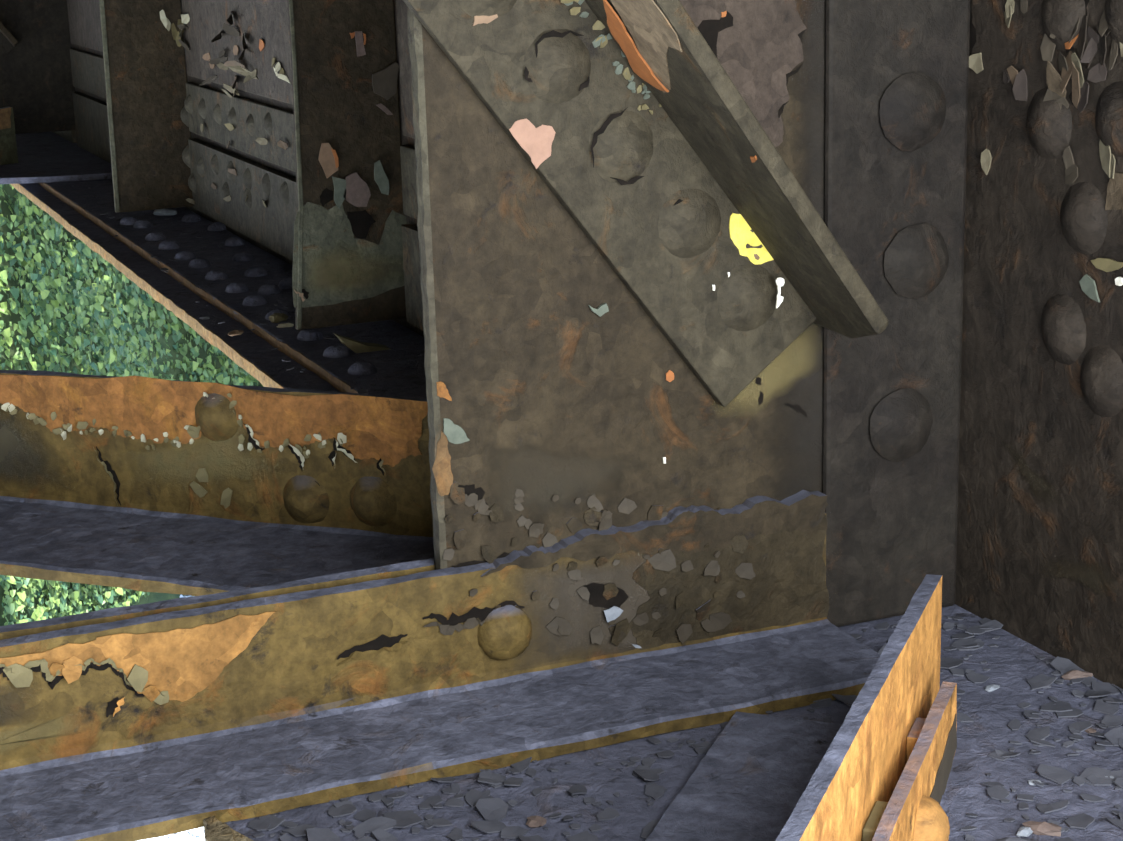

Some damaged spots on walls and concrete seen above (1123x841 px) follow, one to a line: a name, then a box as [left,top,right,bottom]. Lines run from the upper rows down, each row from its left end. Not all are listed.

peeling [560,0,613,48]
peeling [611,0,682,115]
peeling [1040,10,1123,112]
corrosion [0,107,11,130]
peeling [509,119,556,169]
peeling [292,143,407,308]
peeling [1079,258,1123,302]
peeling [1,403,201,450]
corrosion [0,375,452,467]
crack [93,447,121,506]
corrosion [0,611,275,702]
crack [337,601,525,666]